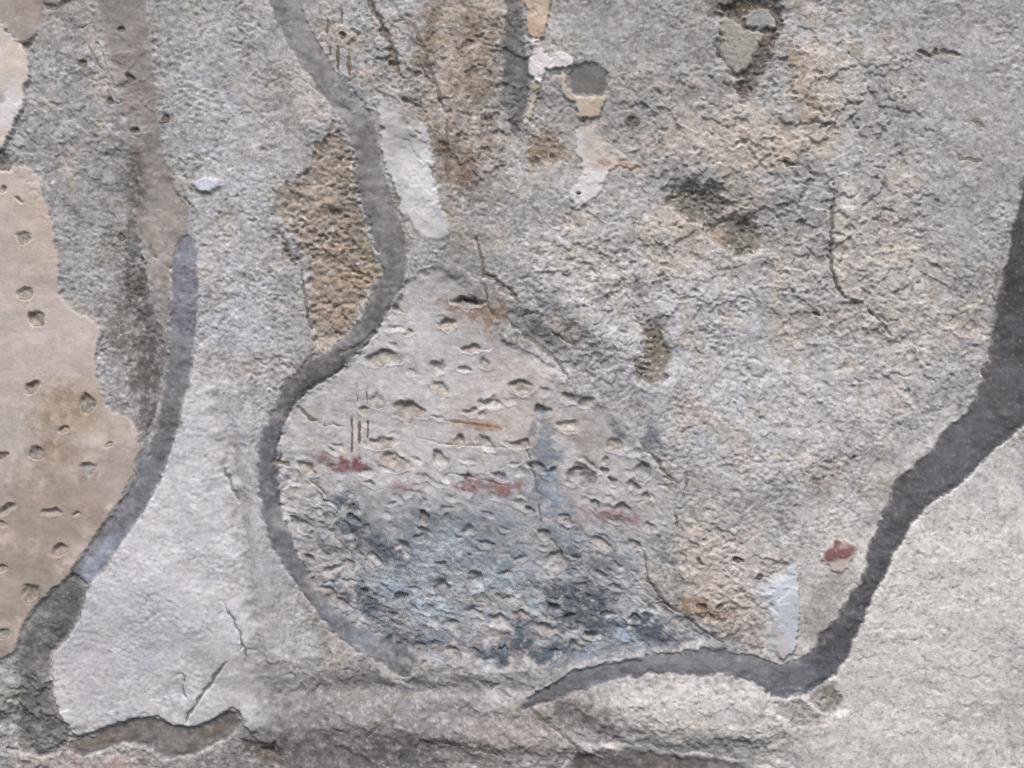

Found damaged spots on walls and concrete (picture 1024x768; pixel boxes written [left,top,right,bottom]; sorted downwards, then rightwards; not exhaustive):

peeling [528,39,574,82]
spalling [17,232,32,245]
spalling [269,118,383,352]
crack [783,158,892,336]
spalling [17,288,33,300]
spalling [28,312,45,326]
spalling [26,382,39,394]
spalling [80,393,97,413]
spalling [29,446,44,459]
spalling [52,543,68,557]
crack [183,605,247,724]